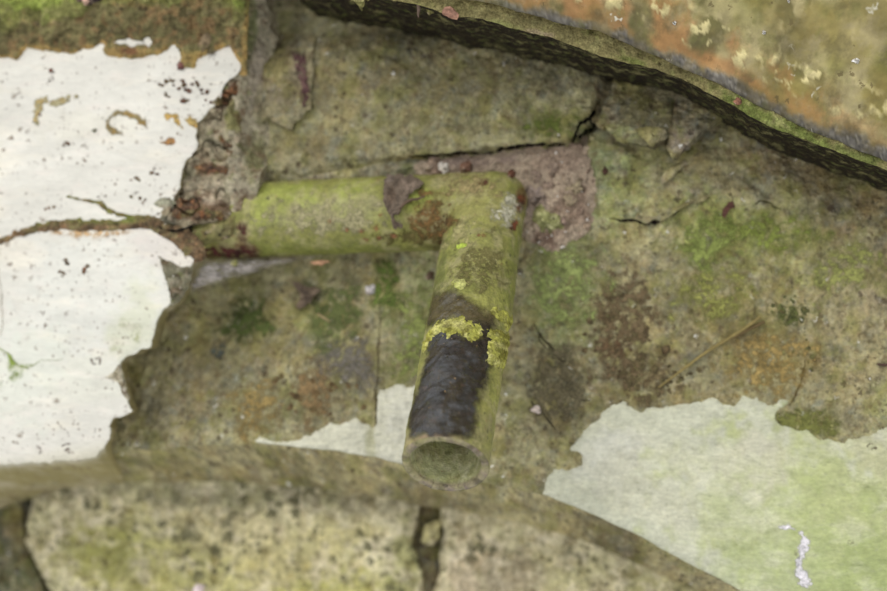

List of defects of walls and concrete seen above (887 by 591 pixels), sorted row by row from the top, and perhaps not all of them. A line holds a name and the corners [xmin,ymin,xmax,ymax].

spalling [0,0,252,246]
rust [157,78,213,106]
crack [411,110,596,158]
spalling [591,74,723,184]
crack [0,195,206,262]
rust [205,225,259,260]
rust [408,188,458,245]
crack [609,207,685,225]
spalling [157,255,193,306]
water stain [408,291,495,439]
water stain [525,344,585,421]
peeling [255,384,415,464]